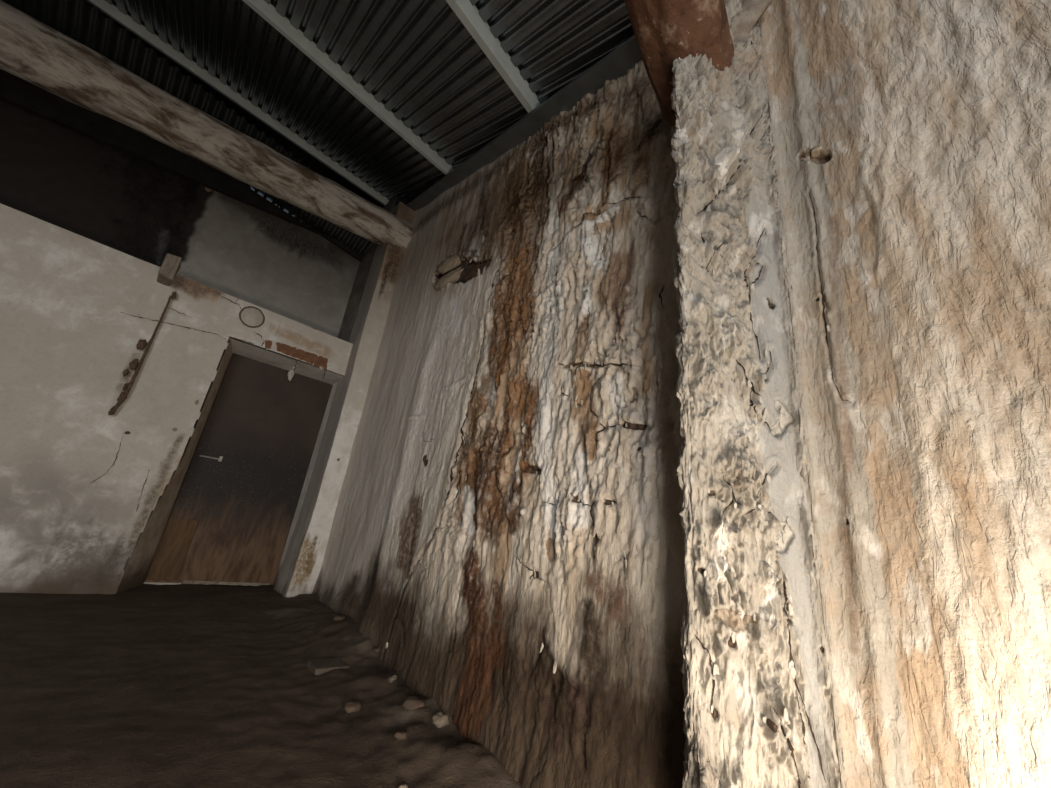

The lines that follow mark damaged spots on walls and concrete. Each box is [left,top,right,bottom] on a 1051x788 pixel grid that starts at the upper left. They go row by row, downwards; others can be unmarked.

corrosion [559,153,593,214]
spalling [799,146,832,165]
spalling [433,229,491,291]
crack [121,293,265,346]
crack [540,152,660,458]
corrosion [456,159,548,544]
crack [516,419,617,540]
corrosion [294,537,317,584]
corrosion [453,550,505,739]
spalling [714,607,758,648]
damp [505,575,671,788]
spalling [762,716,778,733]